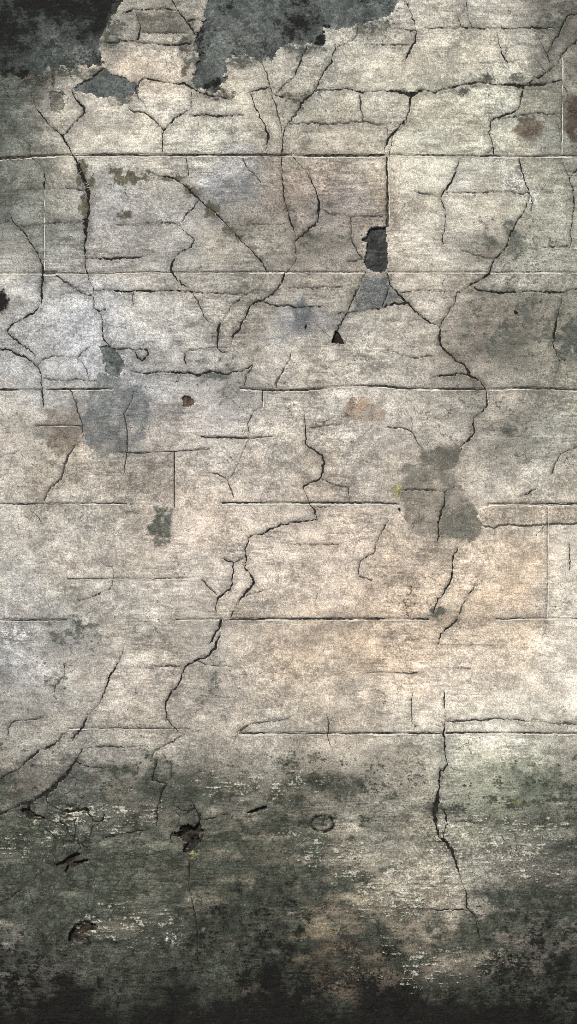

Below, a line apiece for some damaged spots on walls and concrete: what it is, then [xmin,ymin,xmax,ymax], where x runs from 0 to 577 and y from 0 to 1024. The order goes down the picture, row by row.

spalling [0,0,139,113]
spalling [191,0,399,93]
crack [0,0,577,520]
spalling [362,227,388,273]
water stain [483,397,547,464]
water stain [399,433,482,542]
crack [406,487,475,645]
crack [0,414,350,974]
spalling [68,921,98,947]
spalling [174,823,204,852]
water stain [0,738,577,1024]
crack [402,692,576,941]